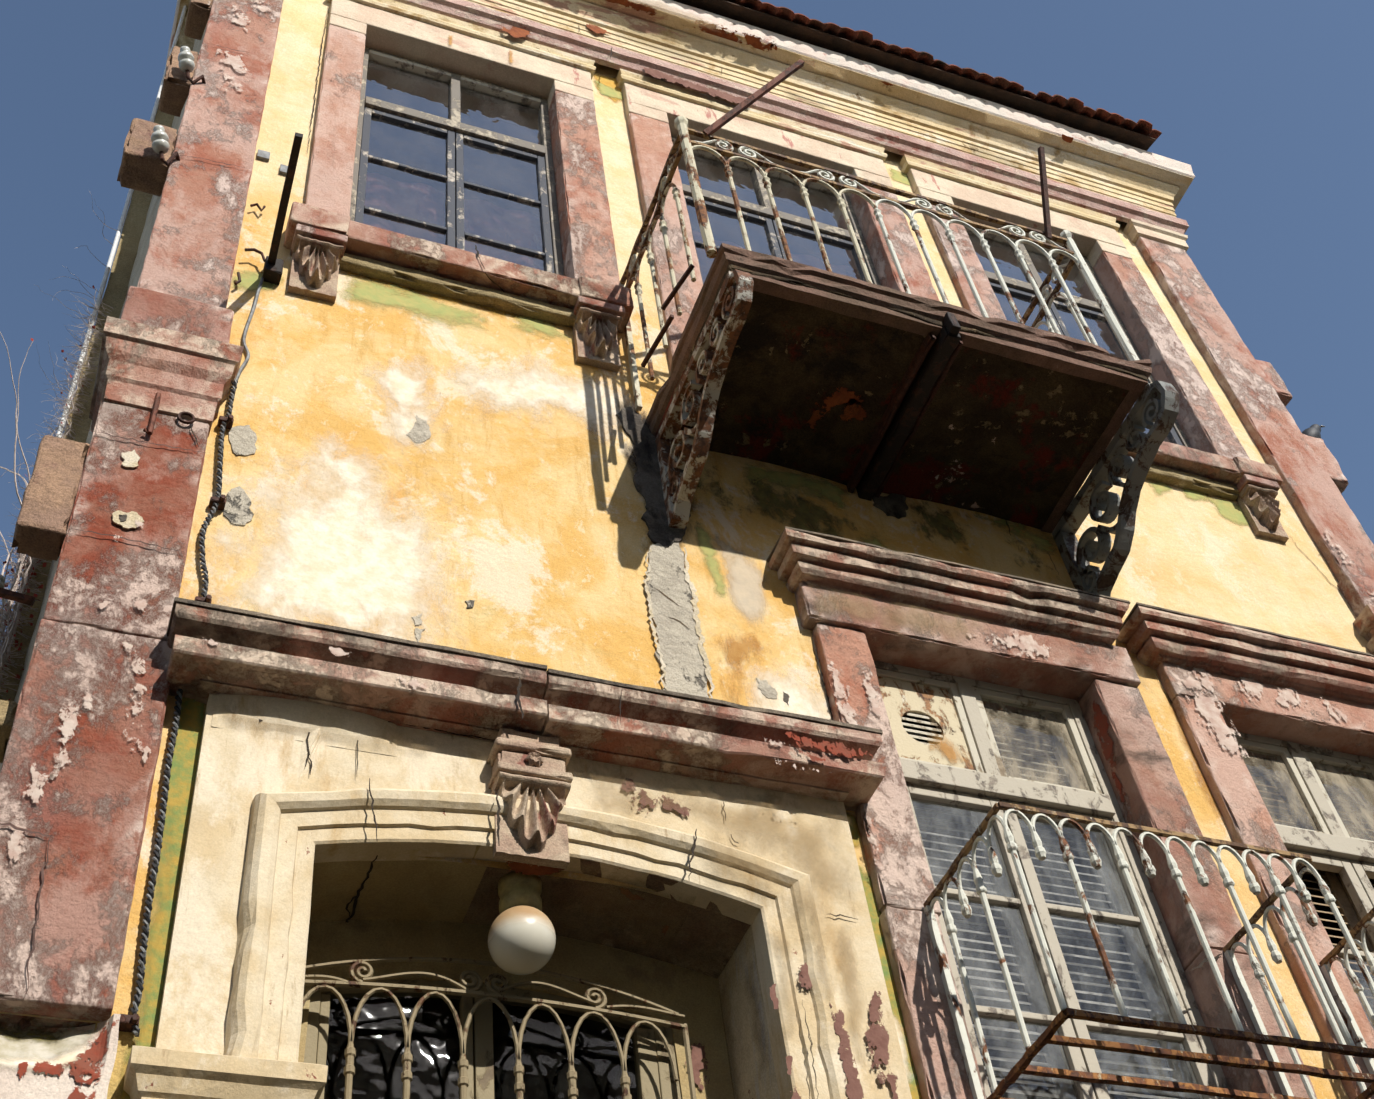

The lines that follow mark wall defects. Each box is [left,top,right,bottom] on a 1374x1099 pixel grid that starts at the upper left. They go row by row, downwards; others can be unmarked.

peeling [683,19,778,51]
water stain [746,465,887,548]
mould [912,503,968,550]
peeling [329,647,349,656]
peeling [123,640,166,776]
peeling [22,694,93,814]
crack [304,732,312,775]
peeling [8,824,27,864]
crack [345,740,378,923]
crack [0,823,53,993]
spalling [0,1023,109,1099]
peeling [829,991,898,1099]